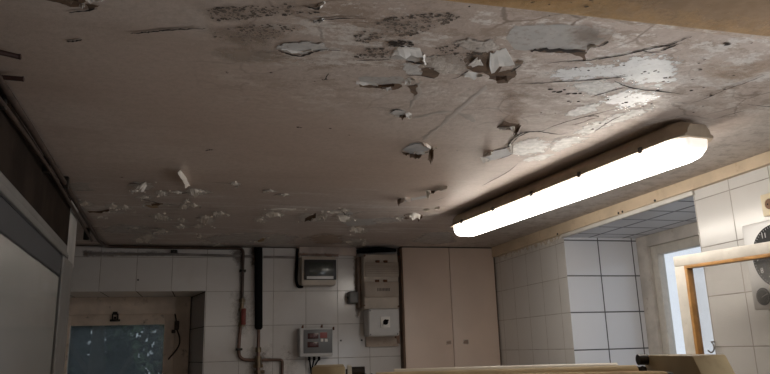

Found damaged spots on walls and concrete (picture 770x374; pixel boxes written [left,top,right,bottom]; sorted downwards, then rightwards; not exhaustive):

damp [207,3,320,41]
peeling [276,41,340,57]
damp [354,13,460,58]
crack [552,36,692,63]
peeling [356,45,440,120]
peeling [452,24,682,163]
peeling [402,126,441,164]
peeling [102,170,231,229]
peeling [388,186,448,221]
peeling [251,208,376,246]